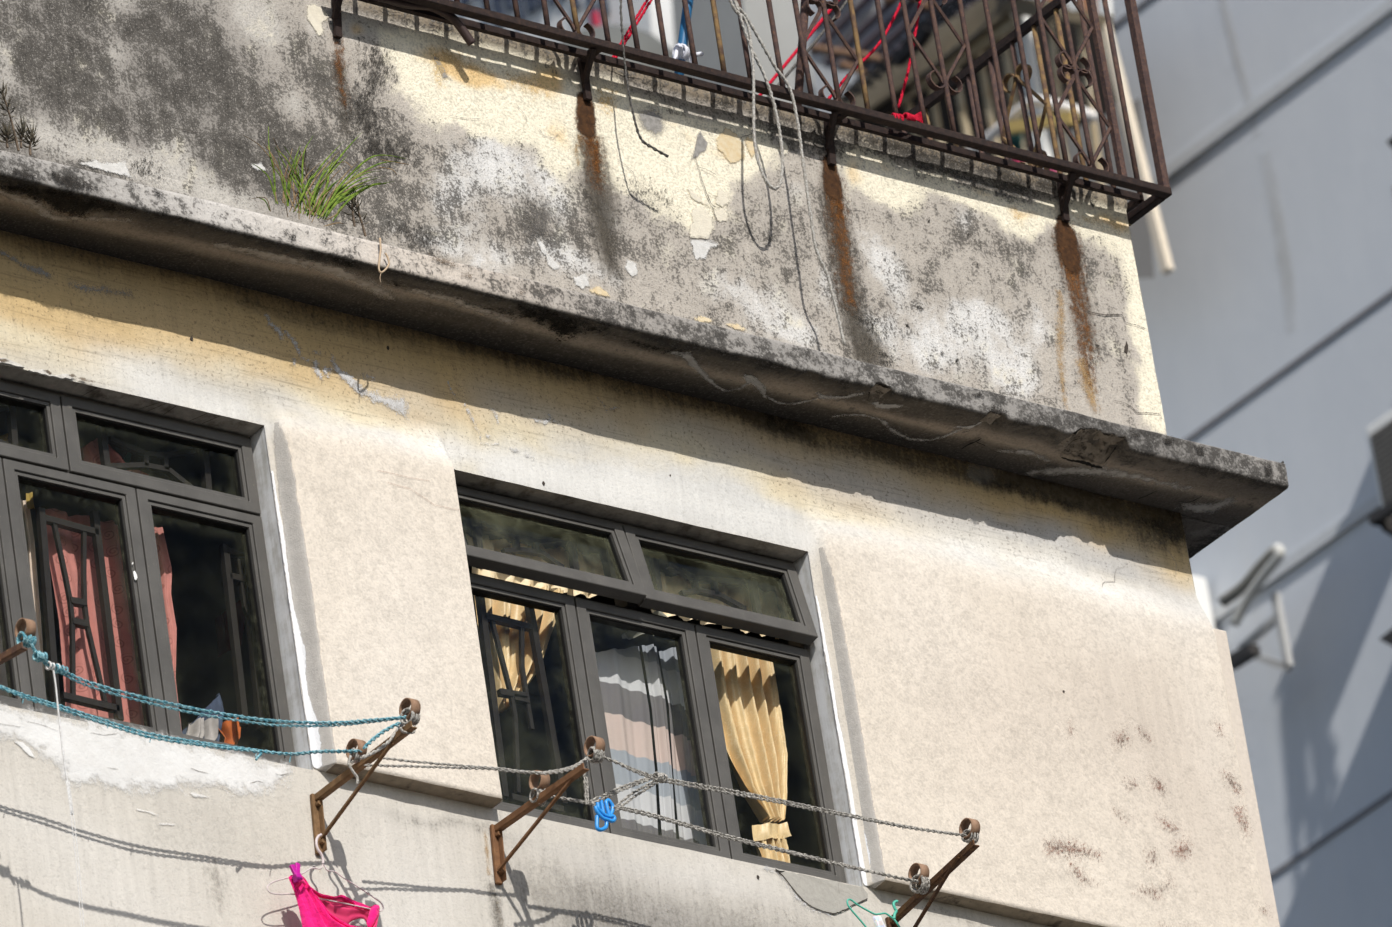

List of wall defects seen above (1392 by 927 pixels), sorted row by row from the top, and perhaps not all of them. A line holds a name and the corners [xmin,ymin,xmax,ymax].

water stain [346,32,428,181]
water stain [0,190,130,221]
water stain [513,196,564,246]
corrosion [575,91,620,276]
water stain [912,152,1042,207]
water stain [213,243,394,299]
corrosion [822,155,883,365]
water stain [264,314,408,420]
water stain [410,289,515,324]
water stain [856,299,910,369]
corrosion [1054,214,1099,410]
water stain [1042,831,1102,886]